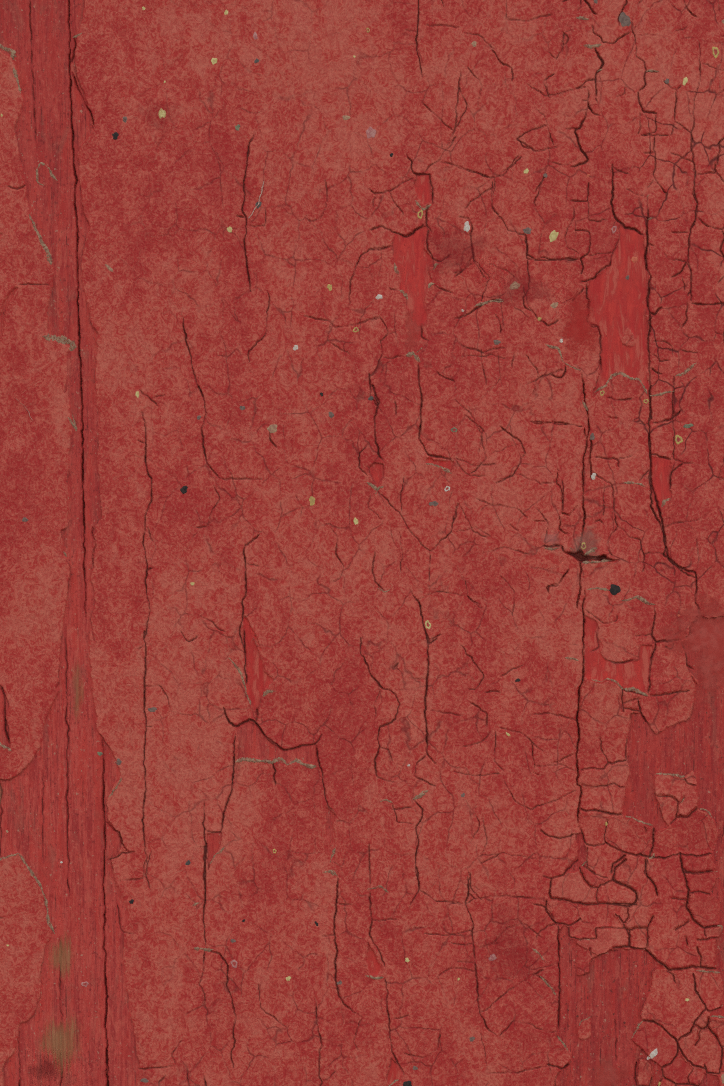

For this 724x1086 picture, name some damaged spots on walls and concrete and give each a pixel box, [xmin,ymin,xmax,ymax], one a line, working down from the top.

crack [41,0,97,898]
peeling [0,0,140,1086]
crack [101,388,171,1086]
crack [179,534,261,649]
crack [181,307,263,529]
crack [234,130,270,366]
peeling [193,617,363,1052]
peeling [365,842,411,1086]
peeling [368,153,455,363]
crack [302,0,724,1086]
peeling [579,163,671,402]
peeling [530,439,724,1086]